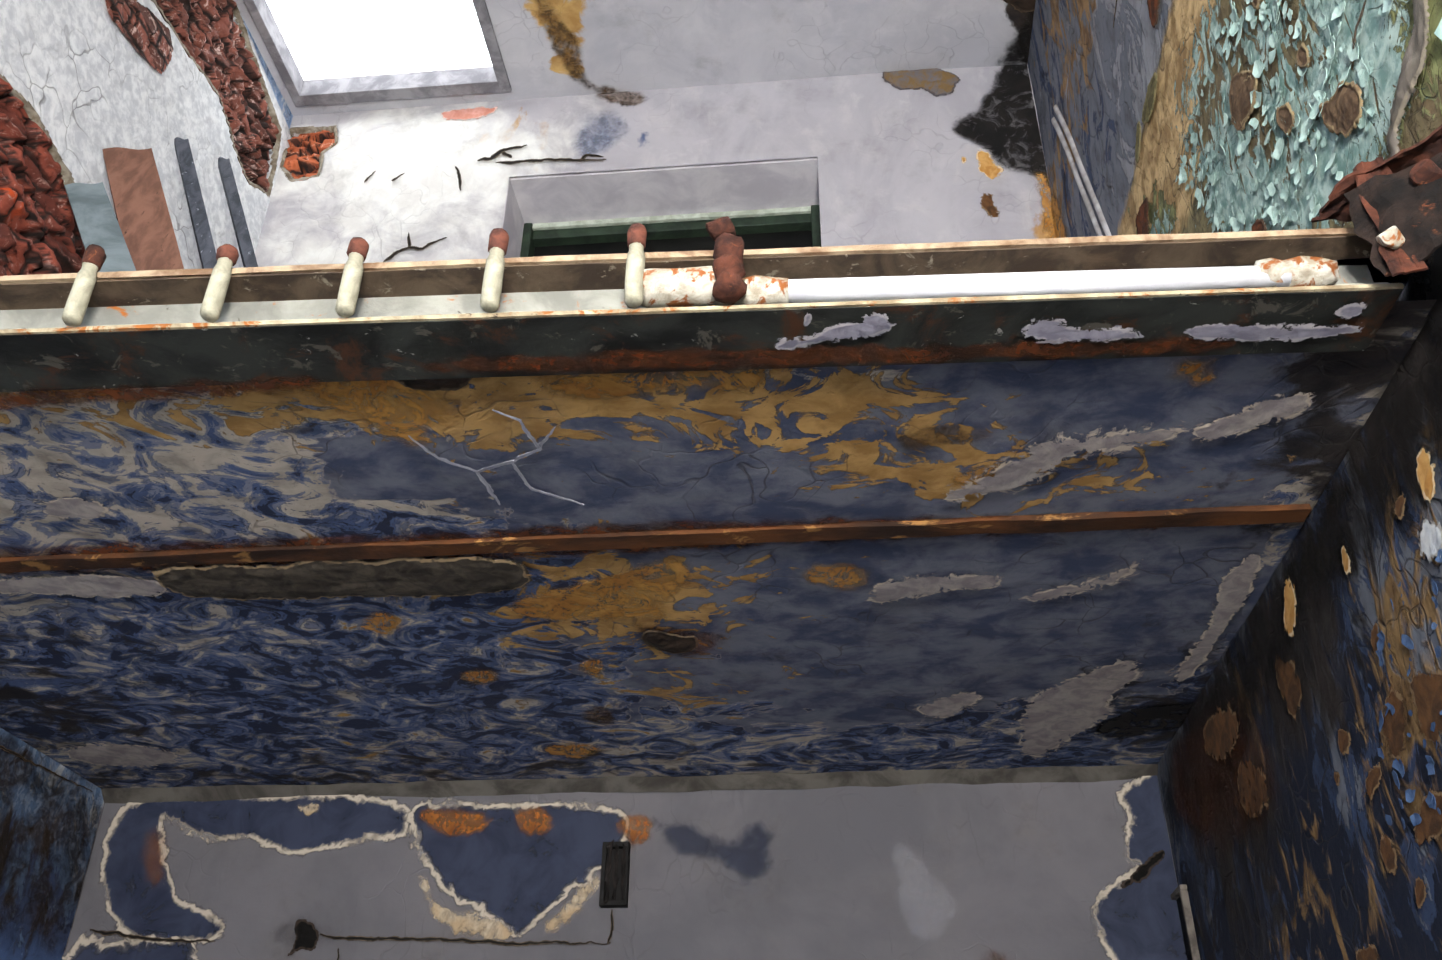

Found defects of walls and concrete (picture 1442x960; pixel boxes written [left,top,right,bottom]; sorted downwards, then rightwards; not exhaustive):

peeling [1175,0,1393,233]
flaking render [0,74,85,276]
crack [455,145,606,191]
corrosion [1051,196,1066,238]
crack [383,232,447,262]
peeling [943,392,1316,504]
peeling [1394,448,1442,563]
corrosion [0,517,963,575]
damp [361,613,397,634]
damp [464,671,494,683]
damp [0,733,630,960]
crack [320,909,614,960]